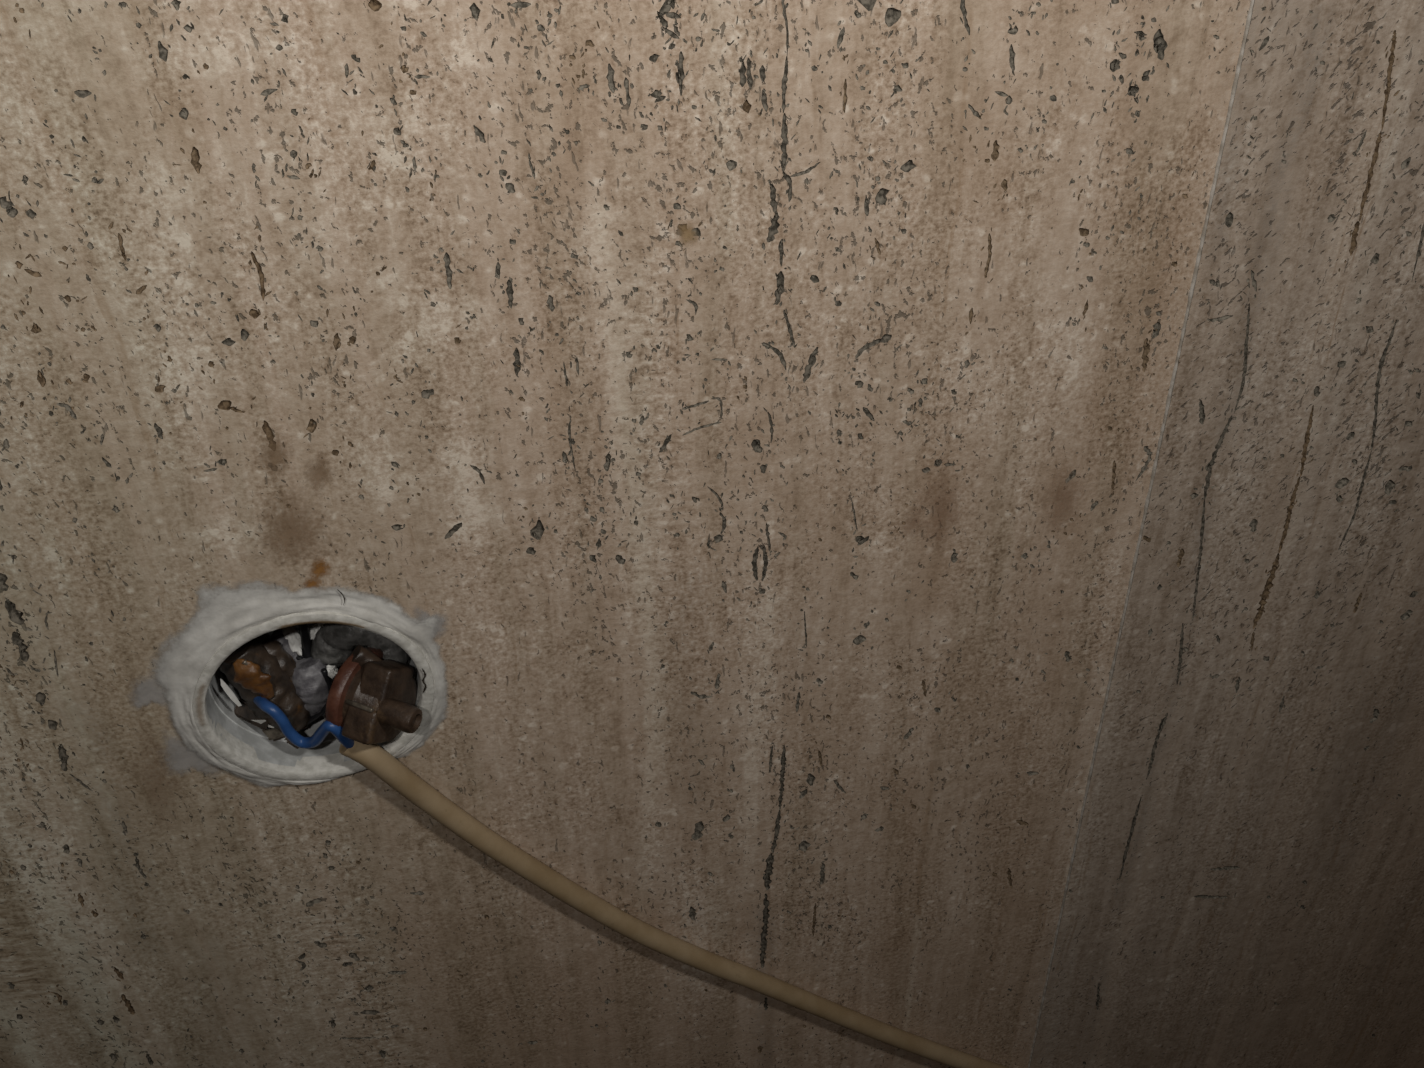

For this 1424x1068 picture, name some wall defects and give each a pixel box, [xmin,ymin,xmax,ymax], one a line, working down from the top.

crack [767,0,820,348]
corrosion [305,562,328,588]
crack [760,745,786,1010]